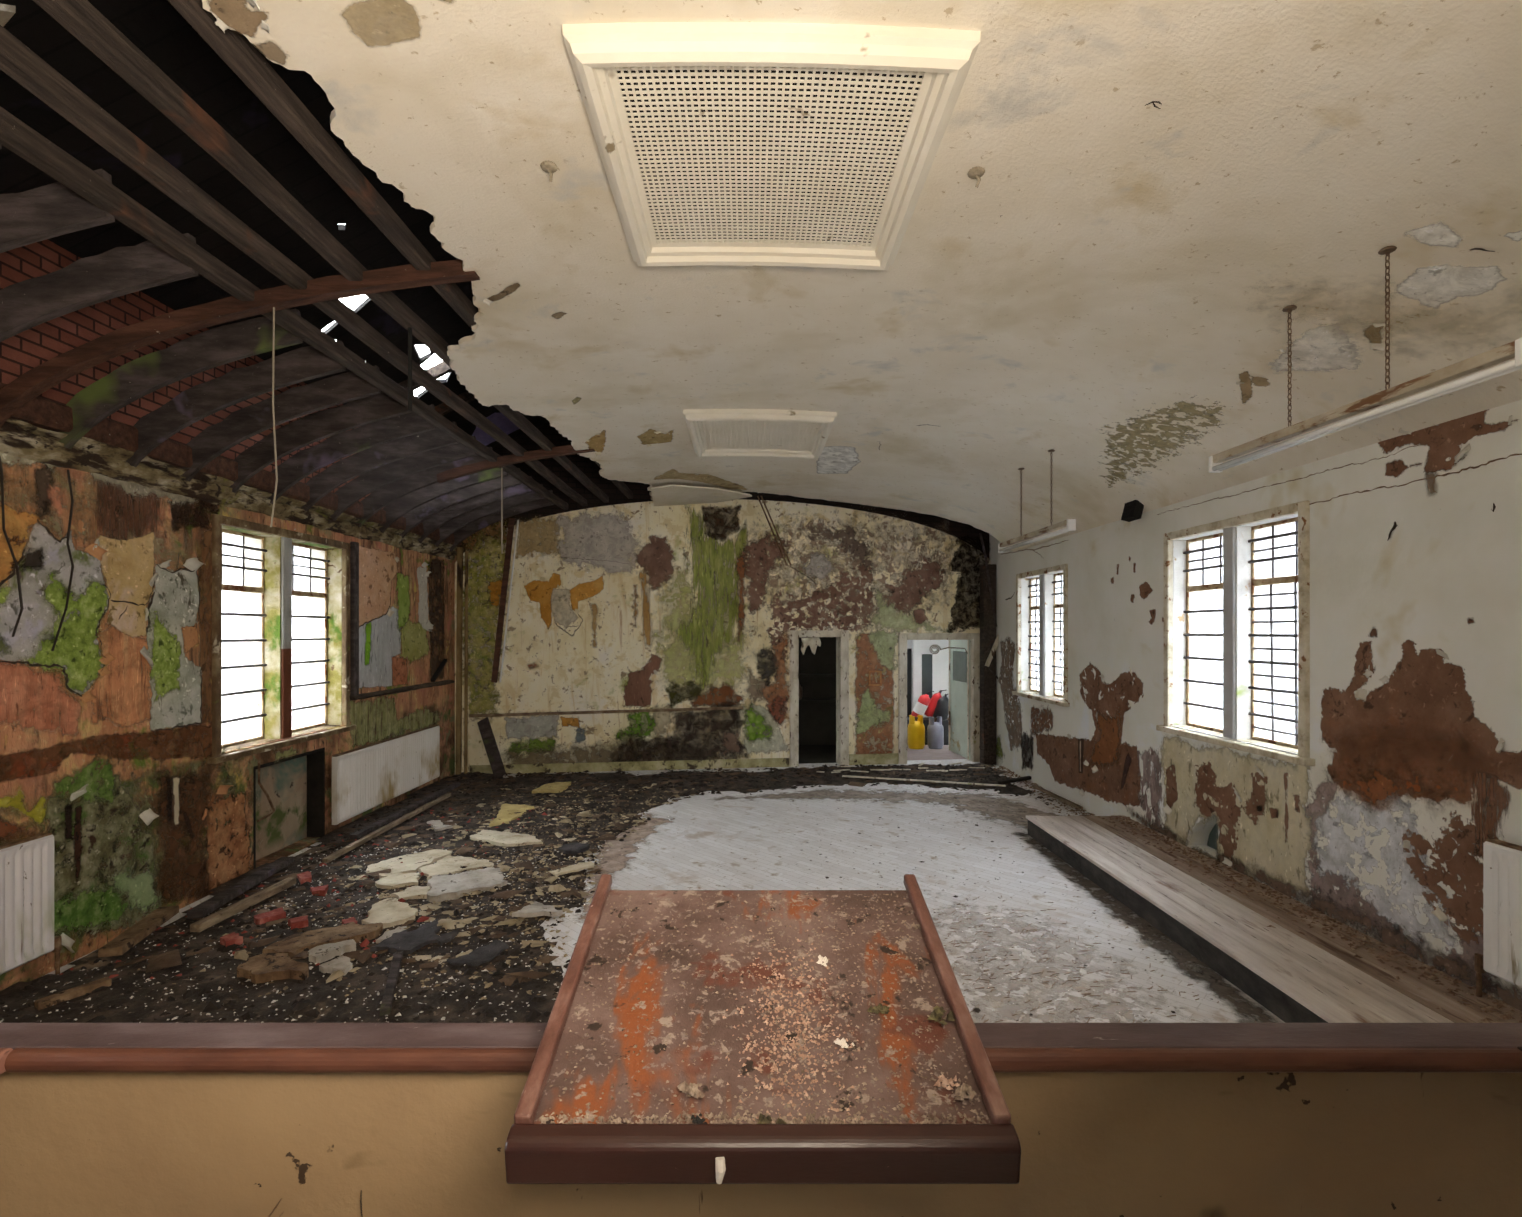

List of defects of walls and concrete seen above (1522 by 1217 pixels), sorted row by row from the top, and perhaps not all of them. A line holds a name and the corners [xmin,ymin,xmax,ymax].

spalling [208,0,286,65]
peeling [342,0,421,47]
leakage [702,505,742,541]
crack [1157,441,1522,541]
peeling [1378,409,1517,477]
peeling [0,519,116,703]
peeling [739,526,945,680]
leakage [0,465,257,904]
peeling [623,654,673,734]
peeling [1033,662,1144,807]
peeling [1162,762,1301,866]
peeling [1320,628,1522,946]